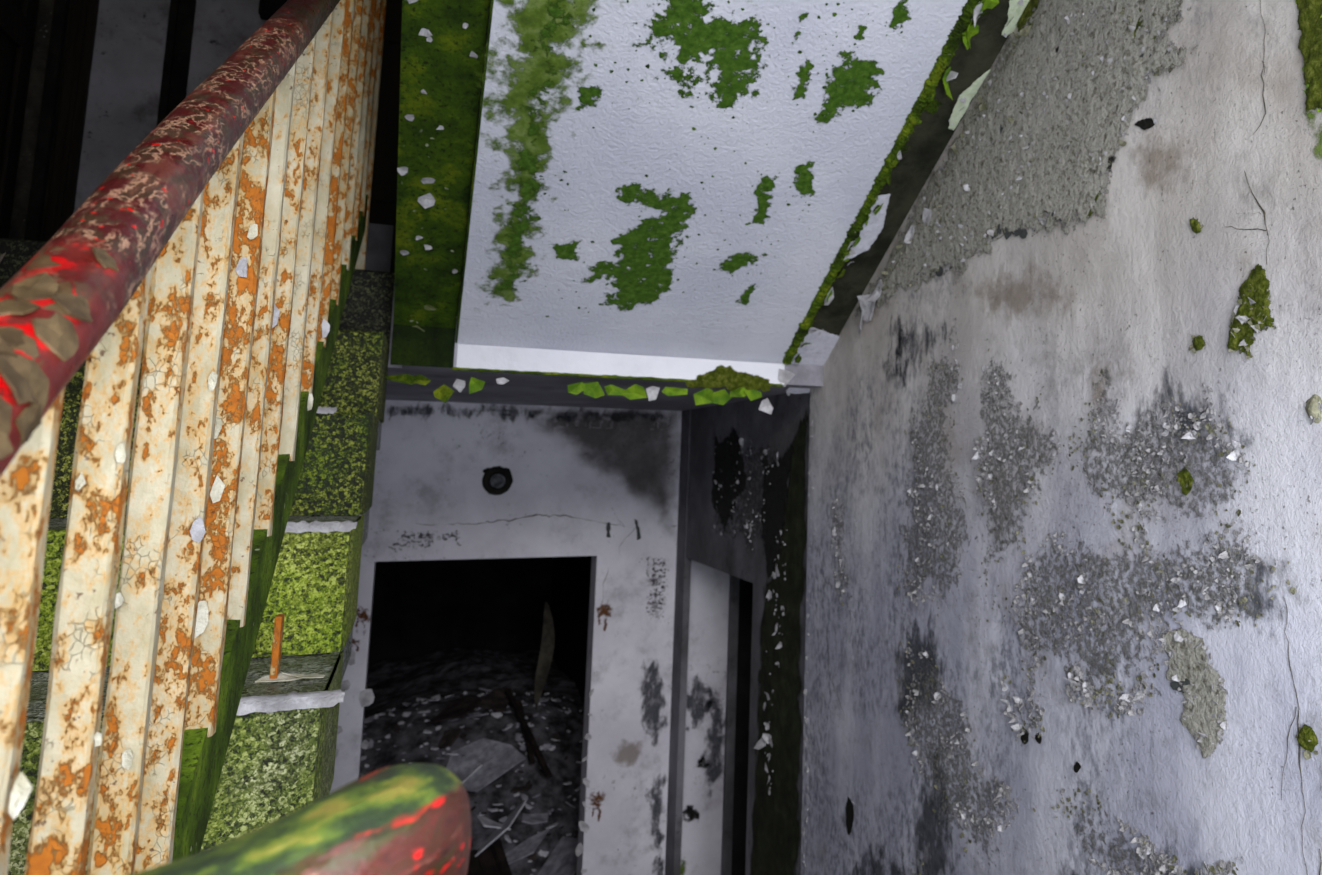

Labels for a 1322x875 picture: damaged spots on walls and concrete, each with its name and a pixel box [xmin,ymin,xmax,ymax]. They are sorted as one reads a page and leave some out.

spalling [856,0,1198,336]
peeling [93,247,119,272]
peeling [75,472,86,491]
peeling [713,438,787,674]
peeling [896,318,1297,758]
corrosion [352,606,370,652]
leakage [641,662,667,746]
leakage [686,676,725,793]
leakage [849,749,954,875]
leakage [895,615,943,727]
peeling [896,641,1242,875]
crack [1281,598,1322,875]